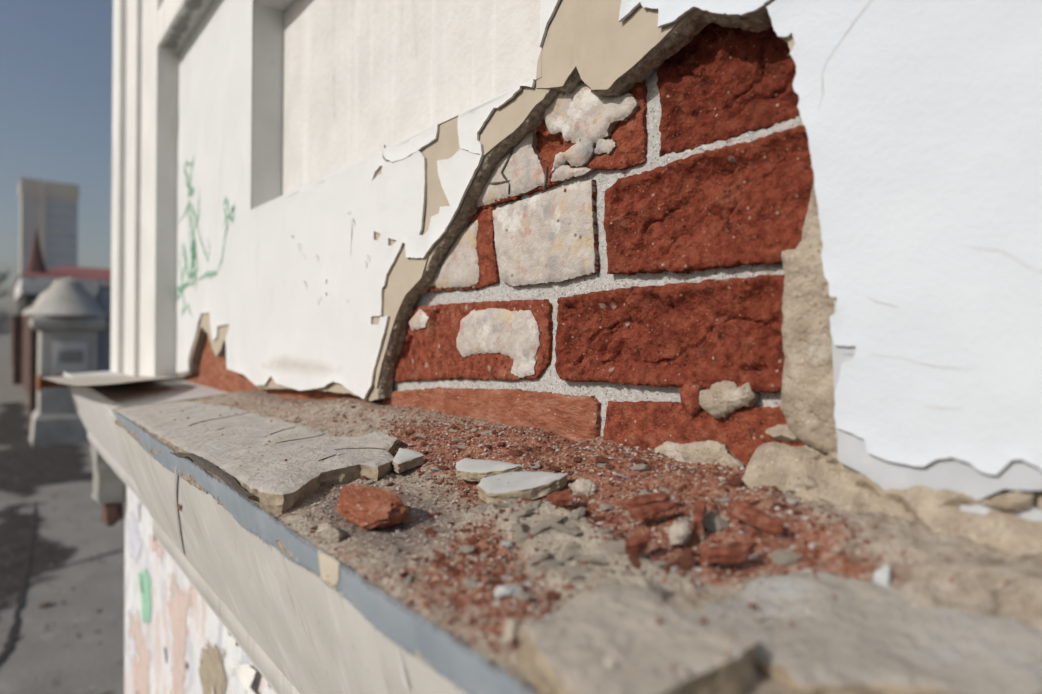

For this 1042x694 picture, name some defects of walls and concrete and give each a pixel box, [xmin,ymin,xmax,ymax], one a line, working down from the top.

spalling [184,313,362,401]
spalling [373,0,1042,556]
peeling [99,501,163,564]
peeling [112,410,534,694]